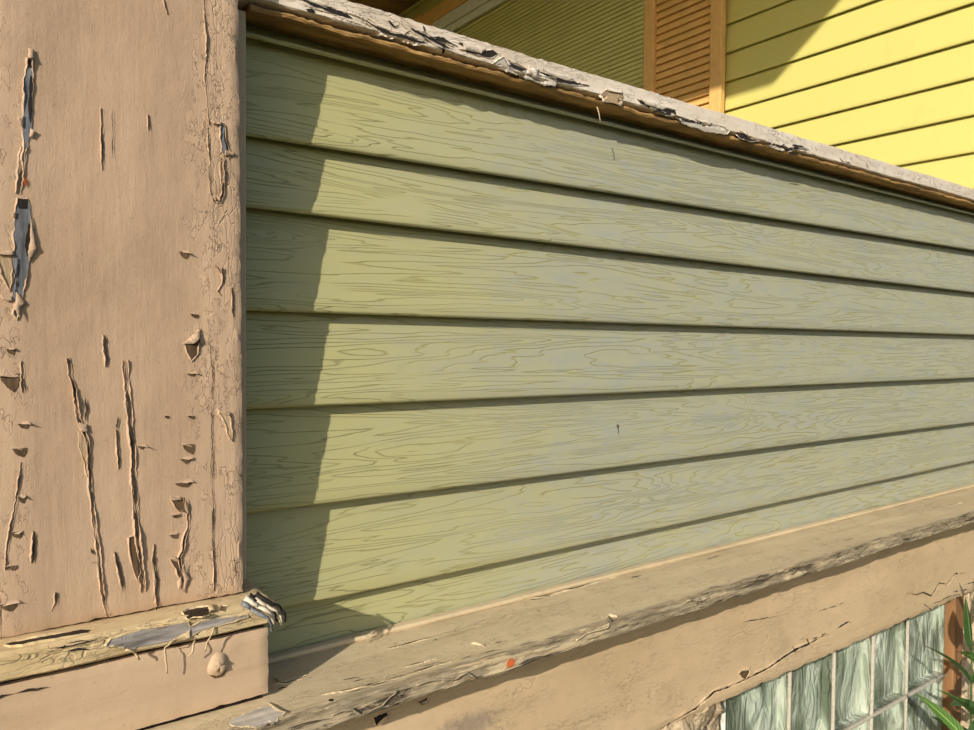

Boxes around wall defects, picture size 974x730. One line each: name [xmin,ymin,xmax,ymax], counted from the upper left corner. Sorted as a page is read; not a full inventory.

peeling [459,43,588,87]
peeling [18,48,35,172]
peeling [597,88,624,120]
peeling [636,98,760,143]
peeling [0,197,37,321]
crack [214,246,234,318]
peeling [182,313,201,376]
crack [44,321,237,651]
peeling [241,591,286,632]
crack [906,573,974,610]
crack [672,603,851,723]
peeling [229,702,288,730]